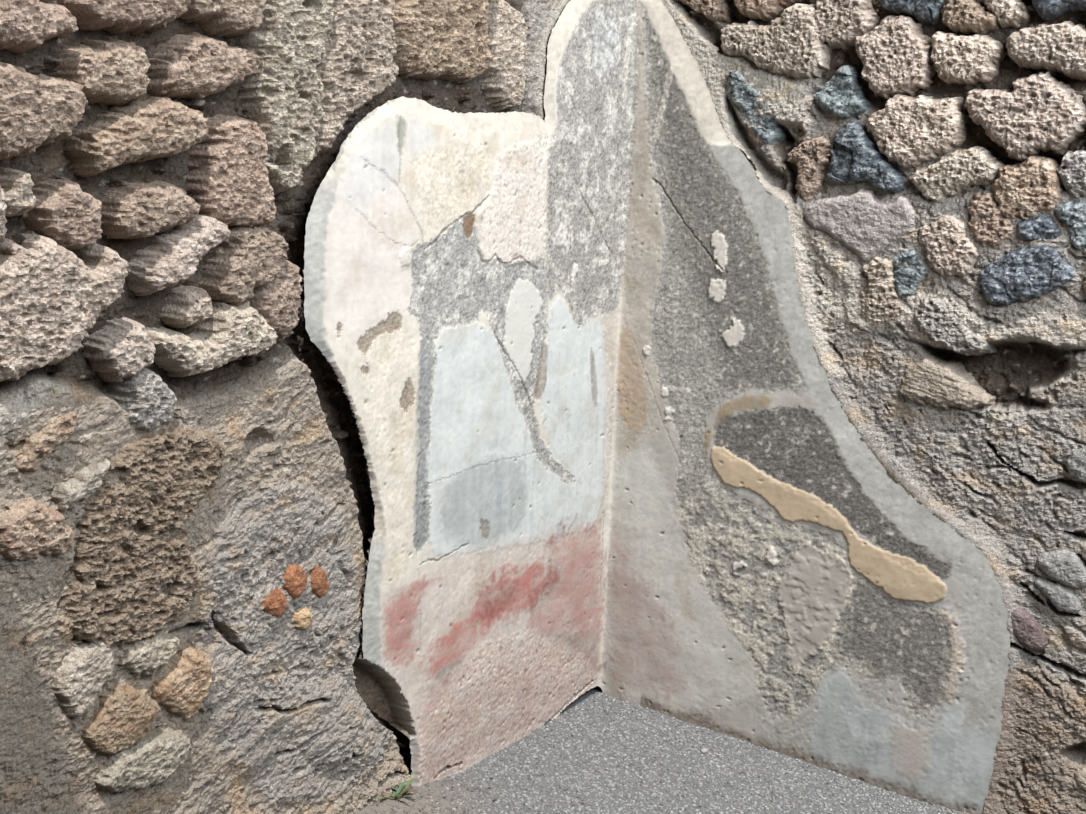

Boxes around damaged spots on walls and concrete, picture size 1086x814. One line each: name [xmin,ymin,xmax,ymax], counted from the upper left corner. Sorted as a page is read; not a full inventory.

crack [355,116,490,251]
crack [477,247,539,271]
crack [493,331,534,409]
spalling [356,0,955,721]
spalling [352,648,417,740]